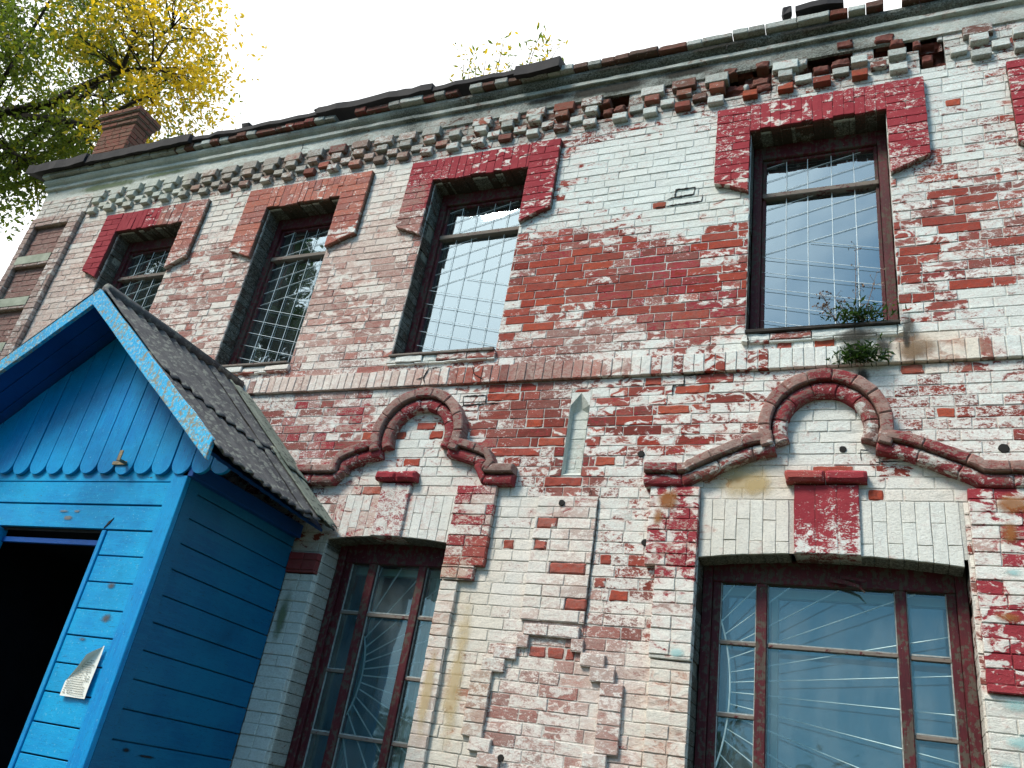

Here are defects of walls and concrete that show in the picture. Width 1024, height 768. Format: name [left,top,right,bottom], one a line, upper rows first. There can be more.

peeling [498,246,710,342]
damp [903,316,932,357]
rust [655,492,676,523]